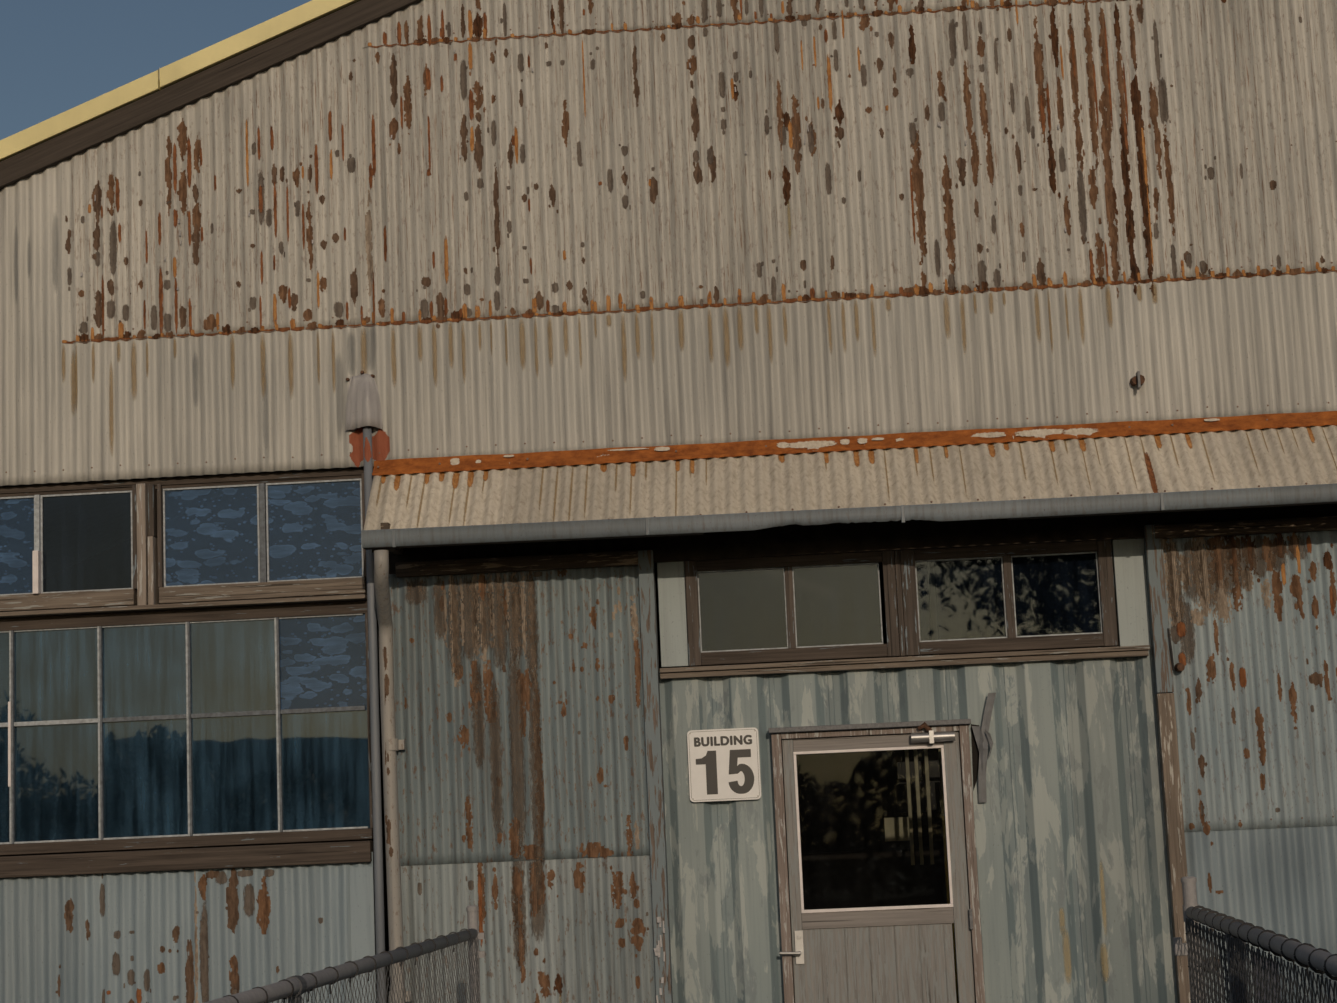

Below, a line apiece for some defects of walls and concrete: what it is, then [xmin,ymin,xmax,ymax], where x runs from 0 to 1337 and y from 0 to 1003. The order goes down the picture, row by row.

rust [368,0,1126,118]
rust [62,18,1337,405]
rust [1281,535,1312,585]
rust [1239,667,1247,688]